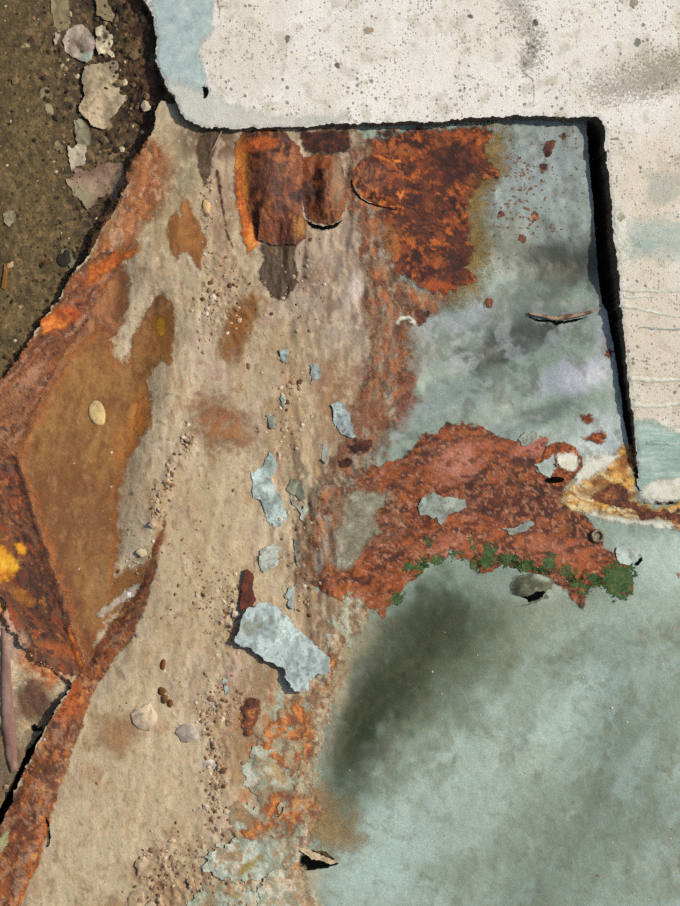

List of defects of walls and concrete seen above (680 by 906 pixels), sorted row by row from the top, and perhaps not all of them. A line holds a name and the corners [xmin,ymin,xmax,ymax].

leakage [0,0,174,379]
rust [167,199,207,270]
rust [234,123,508,331]
peeling [310,364,321,381]
rust [0,139,175,906]
peeling [234,401,638,691]
crack [0,683,72,825]
rust [241,696,316,778]
rust [230,788,366,850]